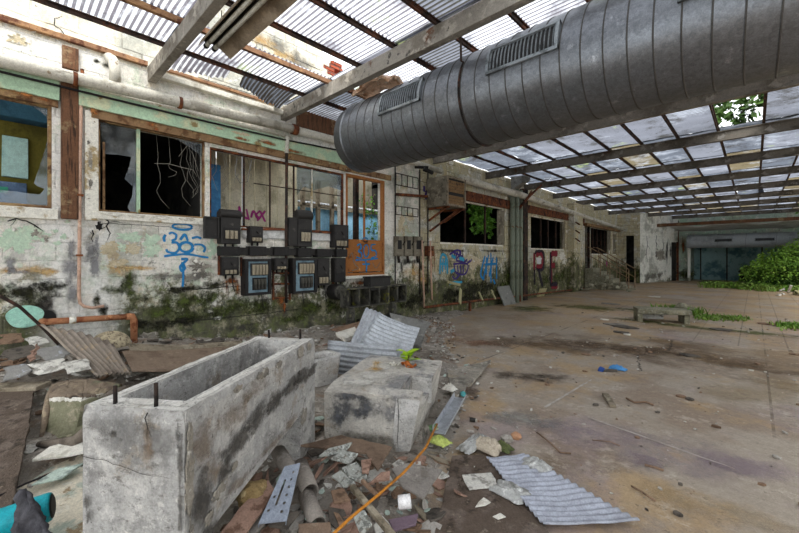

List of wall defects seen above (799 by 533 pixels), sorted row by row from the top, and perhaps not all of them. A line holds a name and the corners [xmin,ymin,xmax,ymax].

peeling [0,225,68,254]
damp [155,273,227,294]
damp [128,316,200,331]
damp [330,362,394,448]
damp [219,363,317,481]